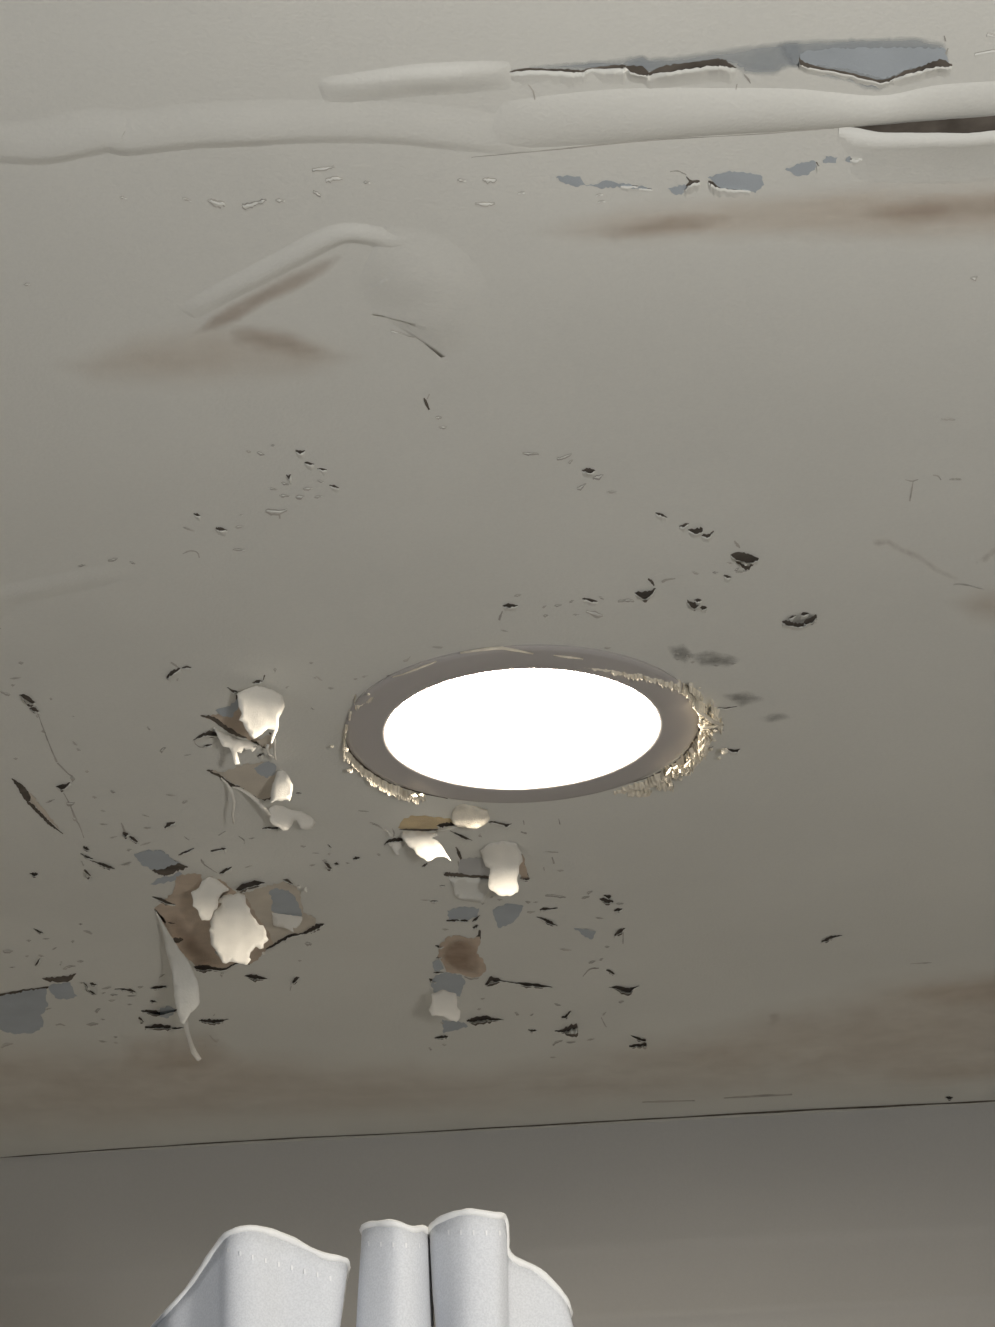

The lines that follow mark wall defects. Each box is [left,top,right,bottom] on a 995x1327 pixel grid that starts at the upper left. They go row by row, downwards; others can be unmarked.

peeling [509,36,952,100]
peeling [785,156,862,176]
peeling [556,175,652,205]
peeling [668,170,764,199]
peeling [0,668,325,1061]
peeling [300,845,360,871]
peeling [358,804,639,1058]
peeling [629,1035,647,1049]